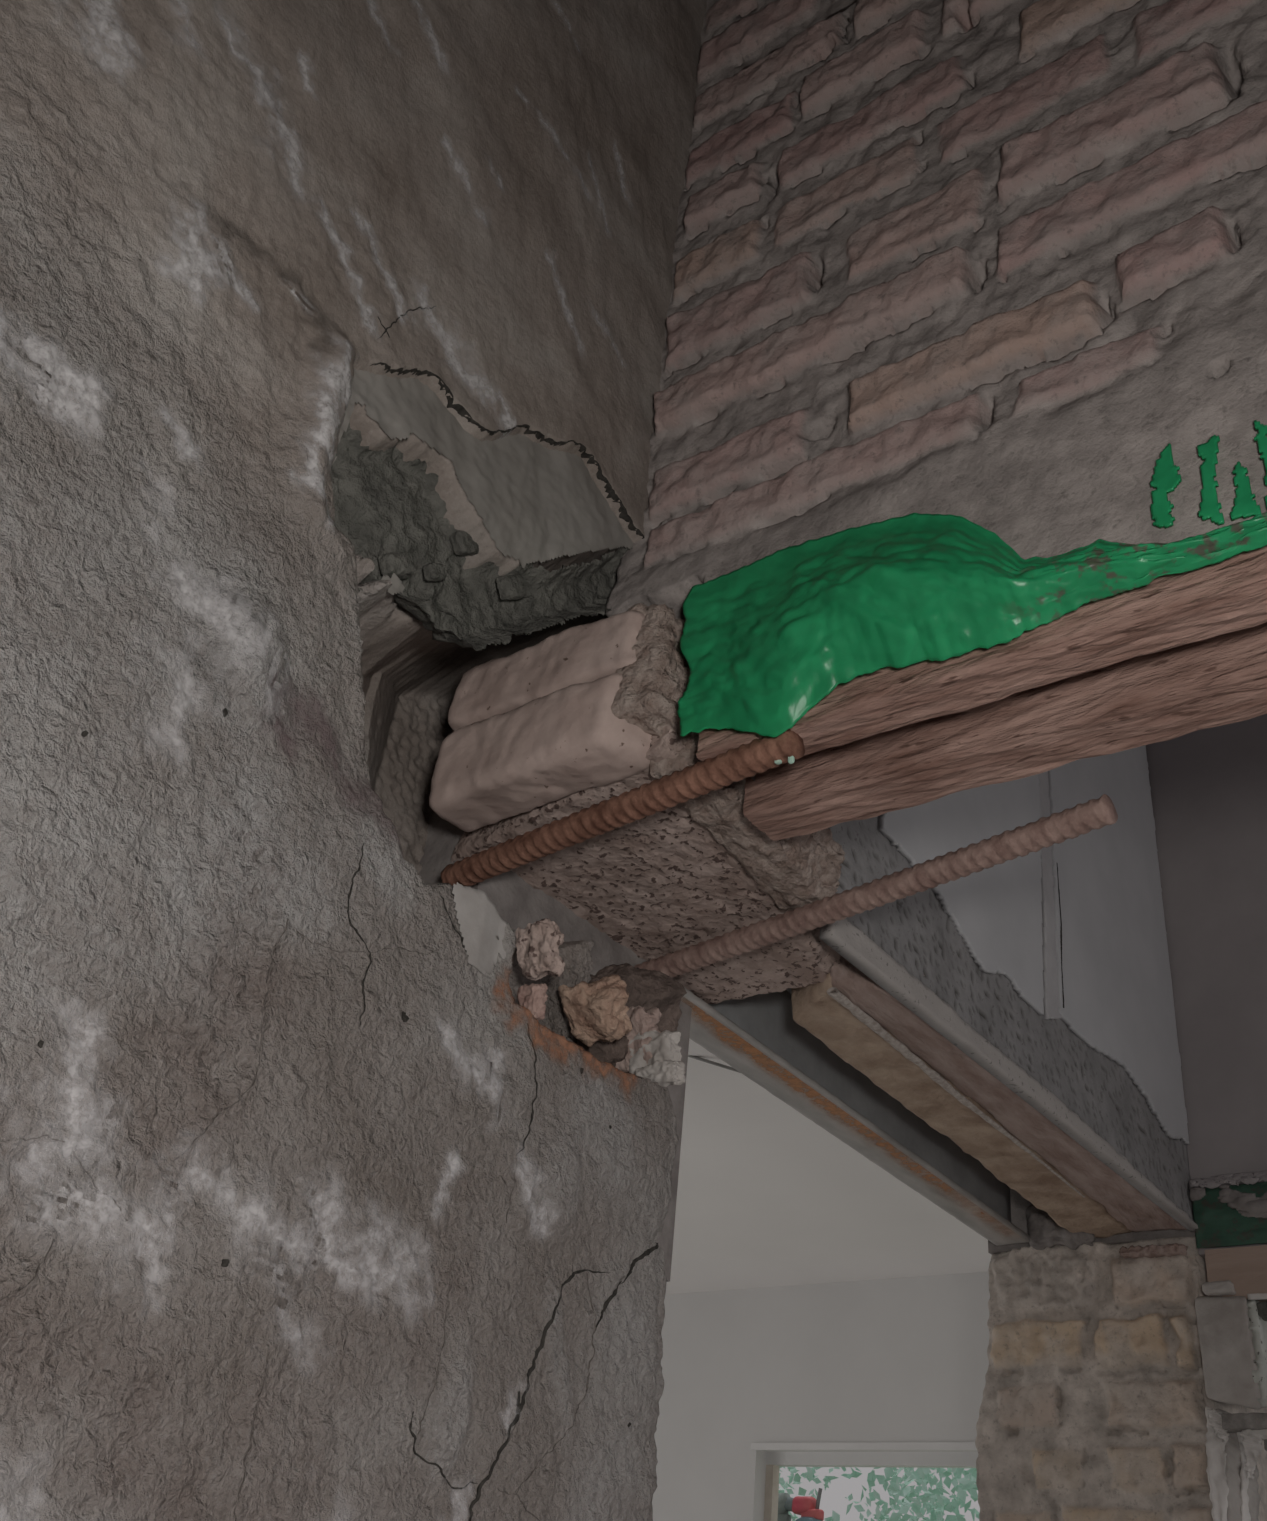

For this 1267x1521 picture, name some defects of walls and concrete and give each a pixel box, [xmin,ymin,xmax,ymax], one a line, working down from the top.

flaking render [331,362,645,652]
water stain [62,1031,106,1161]
corrosion [494,980,636,1091]
spalling [440,729,805,886]
peeling [634,745,1190,1145]
crack [409,1243,659,1521]